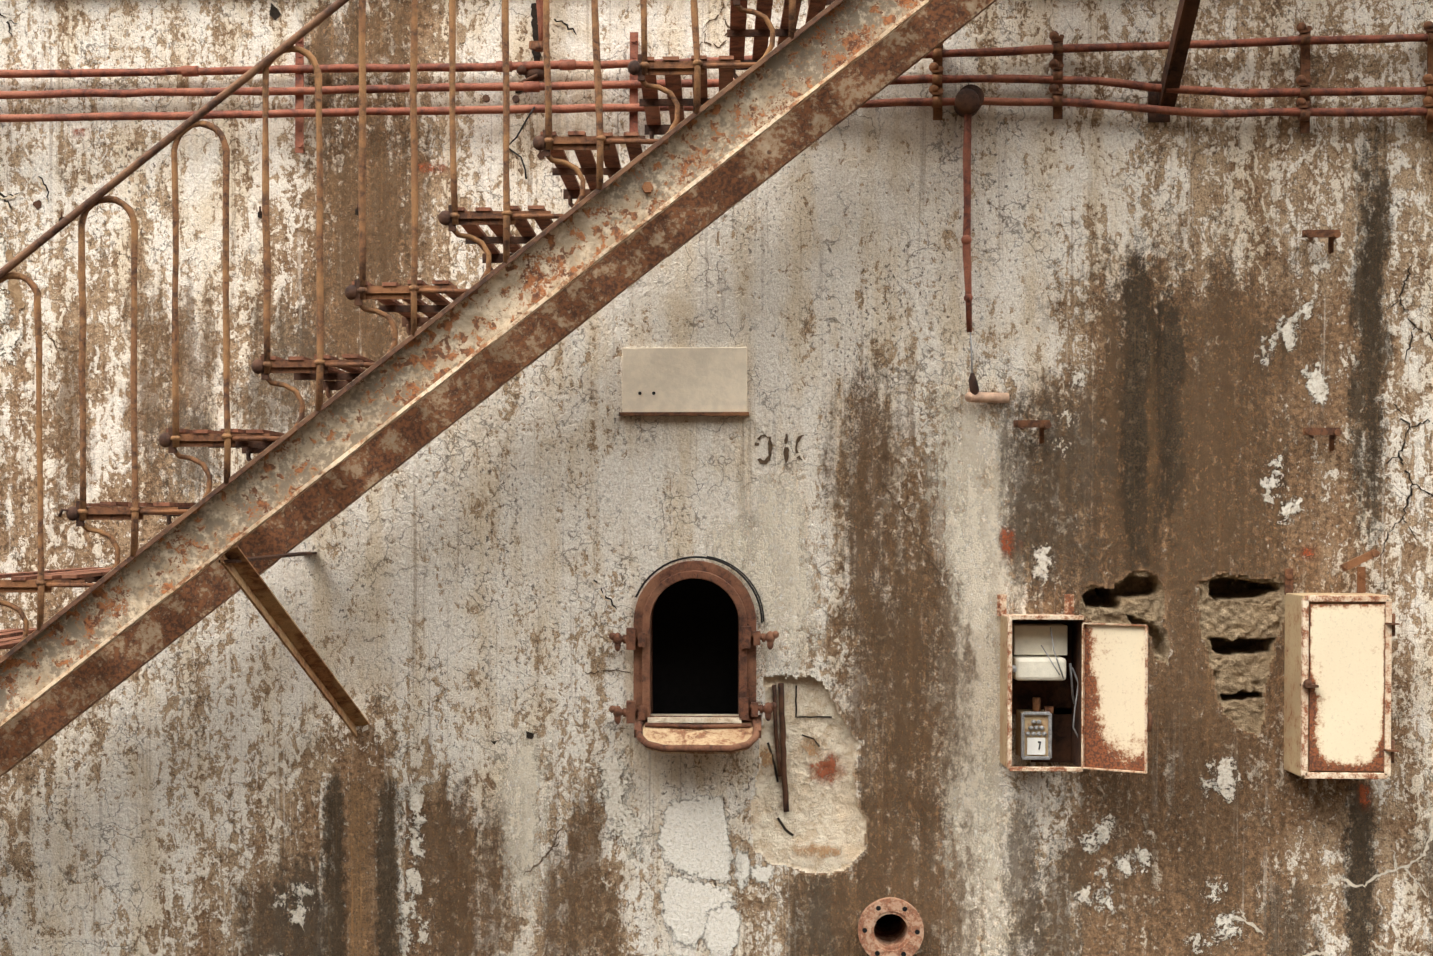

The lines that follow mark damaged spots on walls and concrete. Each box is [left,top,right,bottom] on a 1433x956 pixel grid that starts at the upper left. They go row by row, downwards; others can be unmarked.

leakage [1347,122,1394,548]
crack [1388,266,1433,361]
leakage [705,475,820,671]
rust [1000,528,1024,558]
leakage [787,245,1433,956]
spalling [1079,571,1170,665]
spalling [1197,573,1285,737]
crack [1380,404,1433,556]
spalling [592,673,866,956]